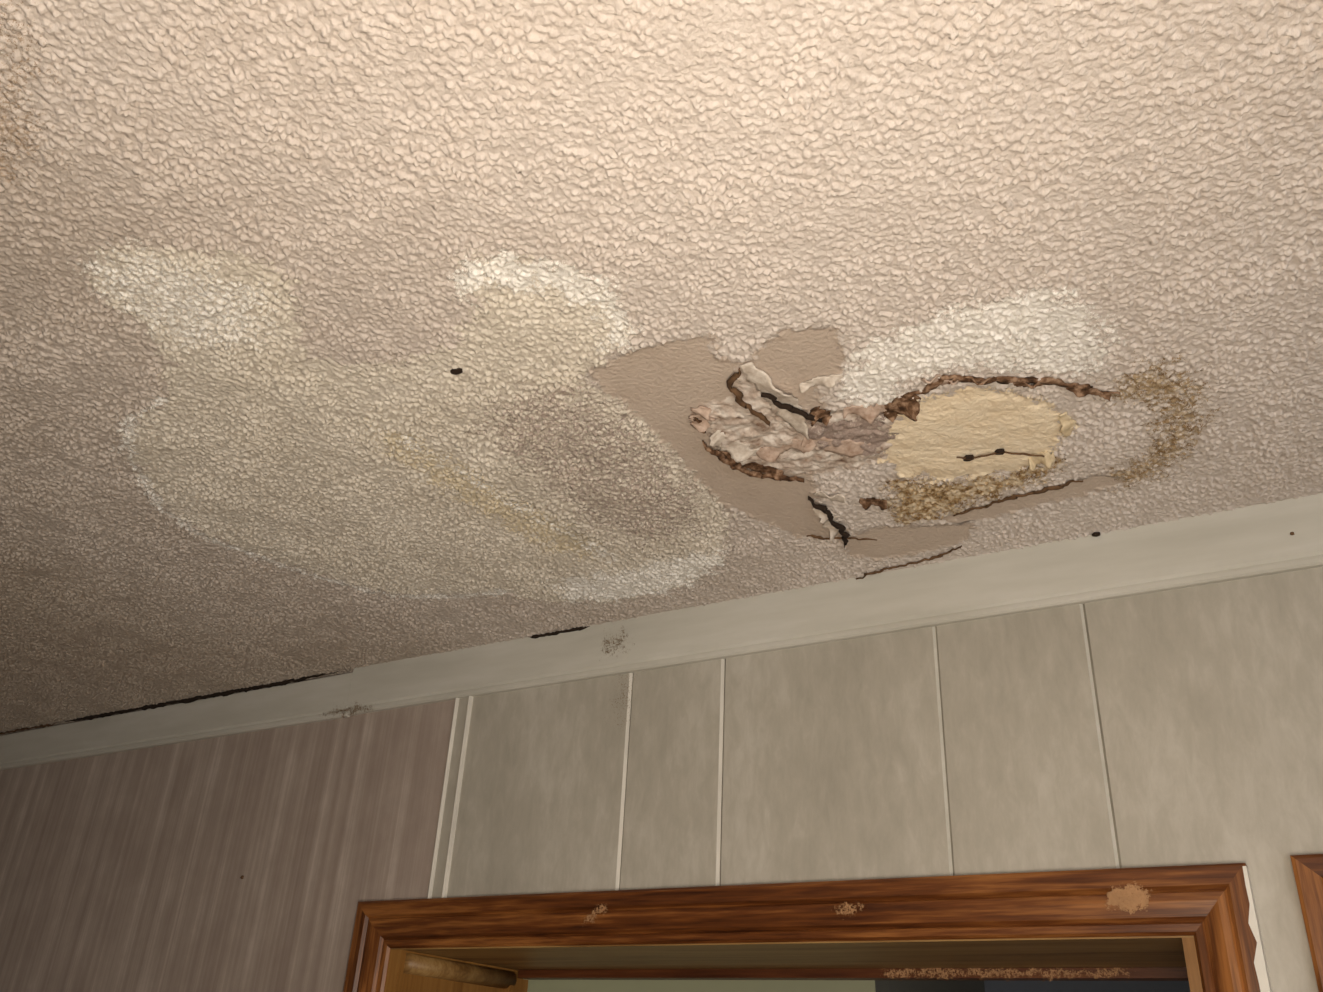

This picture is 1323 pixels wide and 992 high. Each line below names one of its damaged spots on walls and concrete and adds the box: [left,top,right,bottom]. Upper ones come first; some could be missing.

leakage [0,0,91,223]
leakage [54,215,750,610]
peeling [585,325,1127,562]
crack [0,671,339,734]